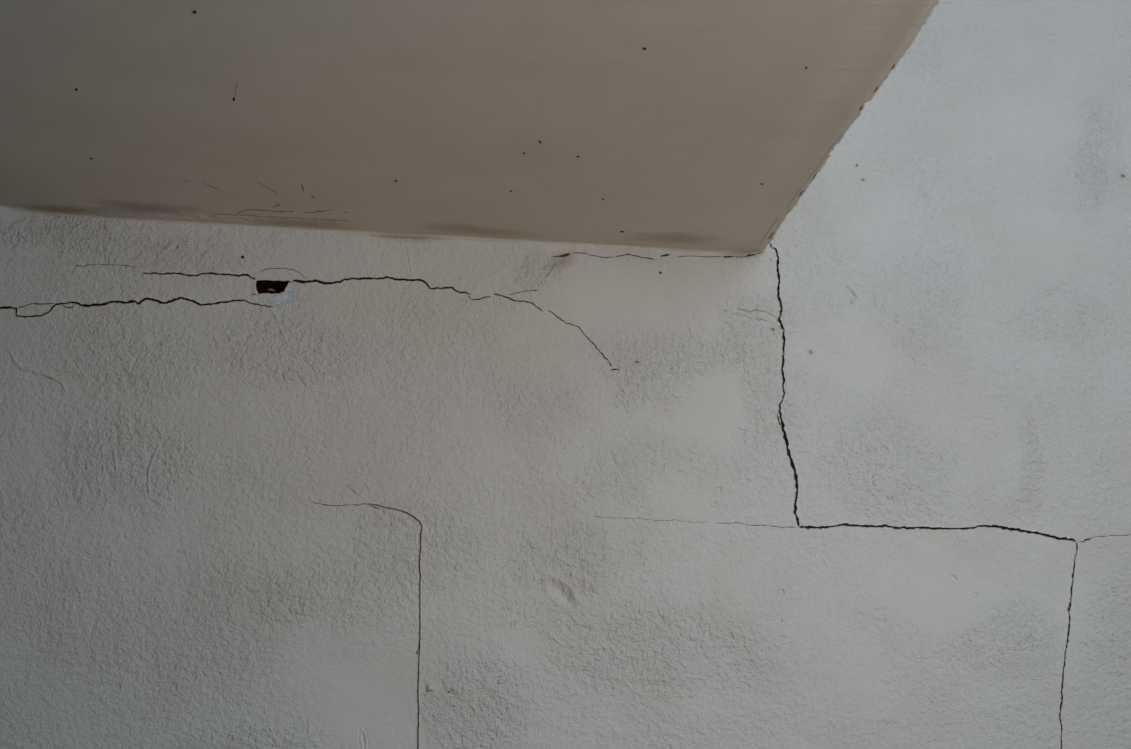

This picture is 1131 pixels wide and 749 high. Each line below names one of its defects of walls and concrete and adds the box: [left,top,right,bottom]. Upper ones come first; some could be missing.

spalling [253,277,300,307]
crack [0,243,1131,749]